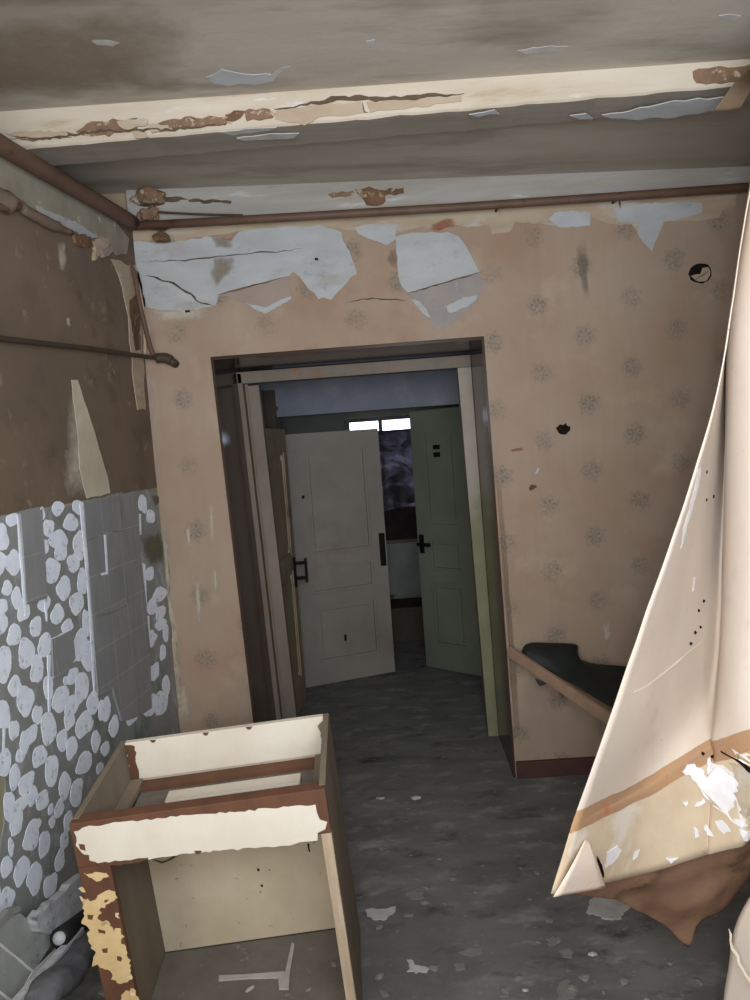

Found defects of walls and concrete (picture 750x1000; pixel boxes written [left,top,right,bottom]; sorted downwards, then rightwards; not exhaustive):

spalling [693,65,750,85]
spalling [6,108,299,142]
peeling [570,97,723,120]
peeling [0,157,737,473]
flaking render [69,380,110,498]